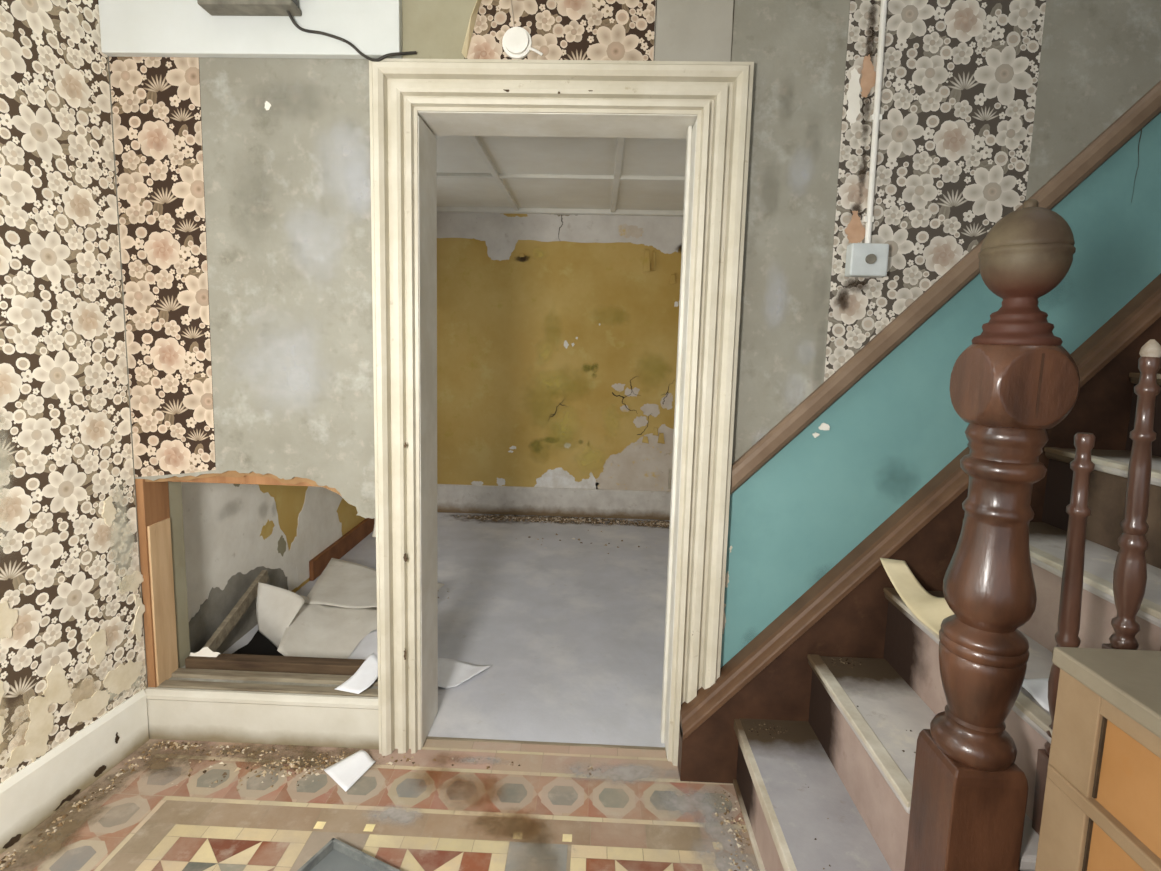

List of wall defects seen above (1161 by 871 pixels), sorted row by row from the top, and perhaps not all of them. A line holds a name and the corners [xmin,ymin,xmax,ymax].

peeling [437,212,683,272]
peeling [534,383,674,491]
spalling [133,459,378,697]